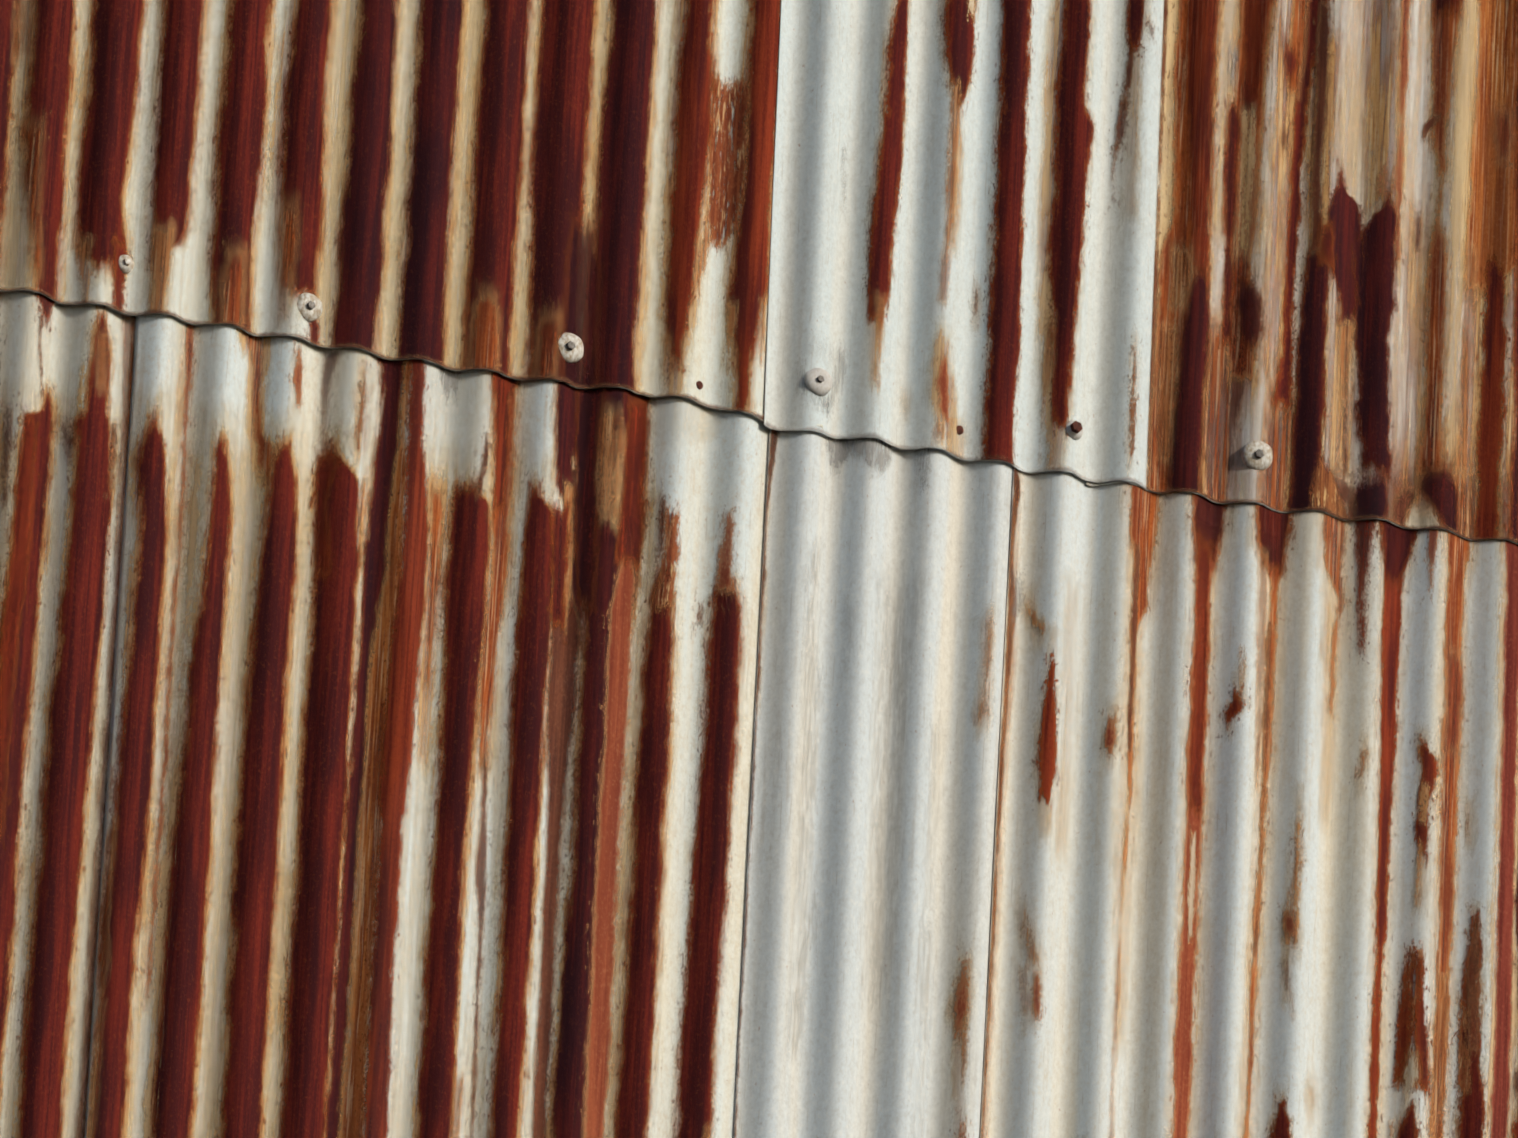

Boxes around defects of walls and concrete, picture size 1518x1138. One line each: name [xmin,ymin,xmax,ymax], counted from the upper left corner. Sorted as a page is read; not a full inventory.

corrosion [0,0,780,1138]
corrosion [865,0,908,368]
corrosion [931,330,958,457]
corrosion [941,0,977,300]
corrosion [959,0,1044,1138]
corrosion [1033,650,1060,808]
corrosion [1046,0,1094,436]
corrosion [1104,0,1518,1138]
corrosion [954,953,970,1076]